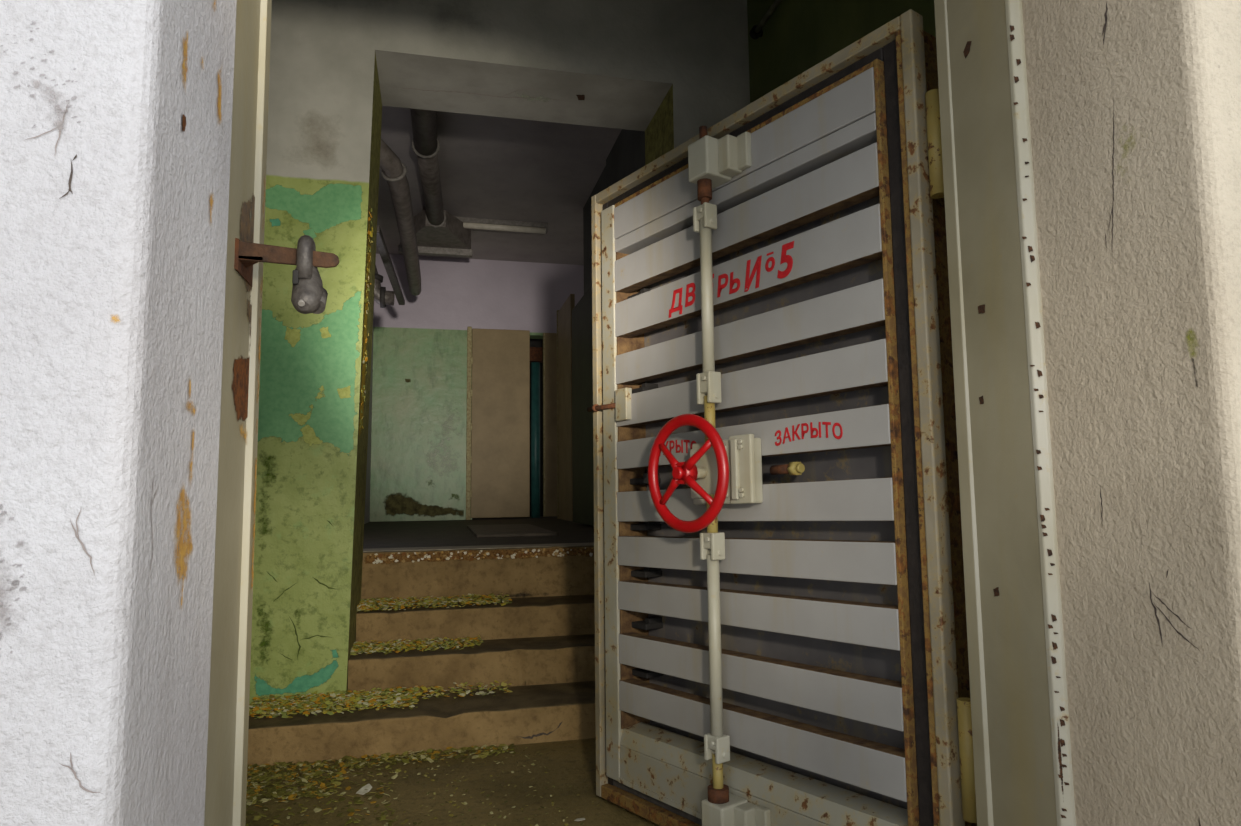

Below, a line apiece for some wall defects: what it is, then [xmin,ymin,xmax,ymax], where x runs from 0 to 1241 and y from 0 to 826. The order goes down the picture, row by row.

crack [26,100,77,199]
rust [240,195,255,243]
rust [232,280,262,439]
peeling [258,184,373,456]